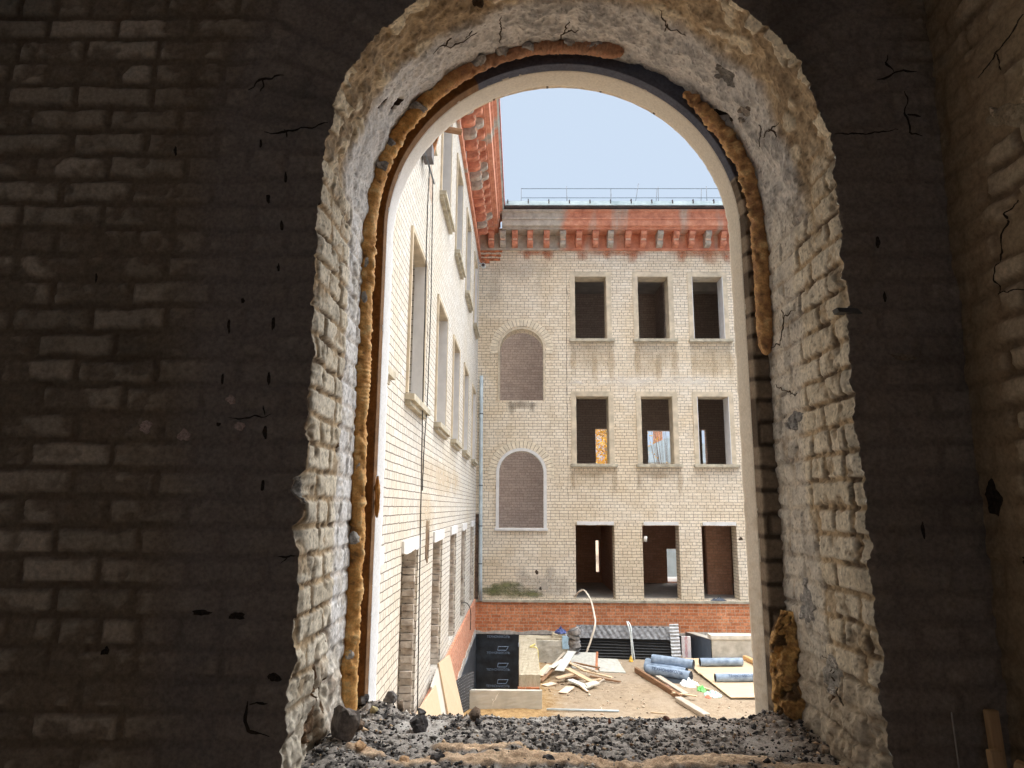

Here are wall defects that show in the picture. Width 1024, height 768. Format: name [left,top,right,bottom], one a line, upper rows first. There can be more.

crack [433,18,502,54]
crack [659,9,686,36]
crack [978,14,1024,78]
crack [248,74,281,91]
spalling [714,64,735,88]
crack [836,55,922,136]
crack [264,122,328,137]
crack [993,200,1024,295]
crack [243,701,269,737]